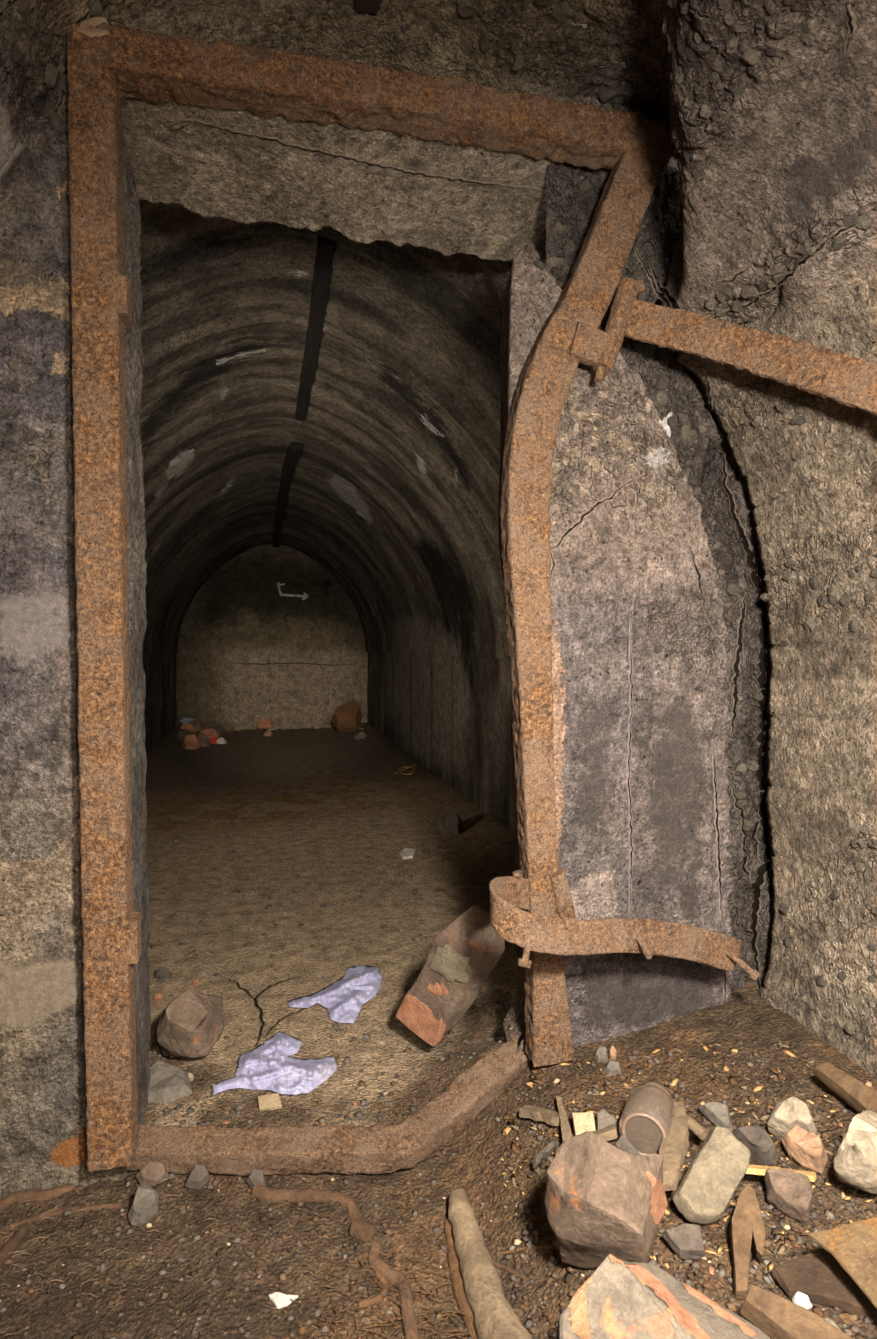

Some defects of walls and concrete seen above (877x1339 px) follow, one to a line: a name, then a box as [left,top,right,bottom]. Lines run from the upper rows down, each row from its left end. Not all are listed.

crack [550,468,642,580]
crack [688,376,773,999]
crack [228,976,309,1047]